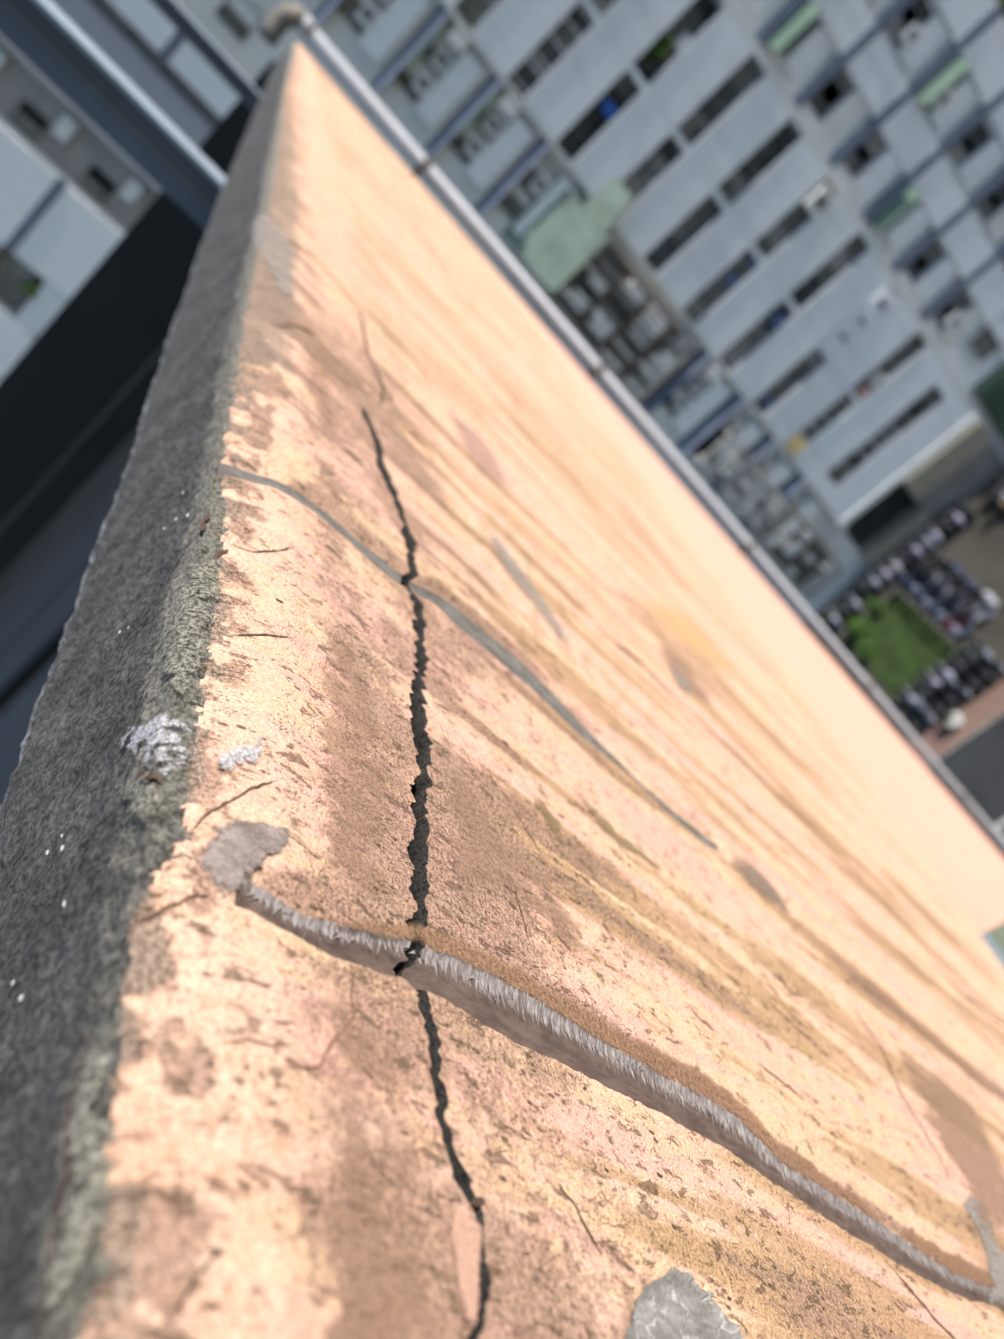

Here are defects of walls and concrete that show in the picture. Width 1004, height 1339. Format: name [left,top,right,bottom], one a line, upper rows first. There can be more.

crack [229,631,292,639]
crack [274,239,492,1339]
crack [224,967,356,1069]
spalling [624,1268,744,1339]